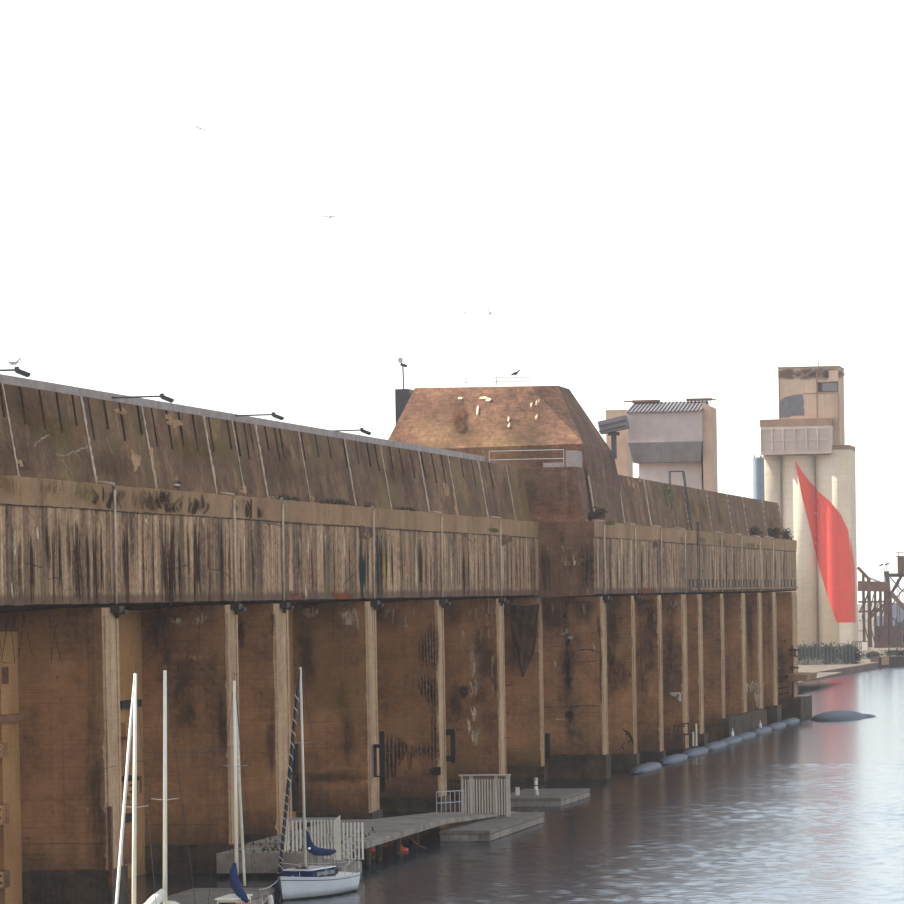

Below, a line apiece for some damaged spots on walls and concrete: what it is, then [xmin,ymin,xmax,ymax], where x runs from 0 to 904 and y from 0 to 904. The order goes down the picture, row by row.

damp [91,486,125,509]
spalling [130,447,157,481]
crack [0,434,538,544]
damp [11,520,104,606]
damp [142,491,262,606]
damp [298,533,416,629]
damp [415,541,432,595]
damp [450,548,485,596]
damp [561,532,626,683]
damp [636,546,677,691]
spalling [462,630,479,745]
spalling [491,654,500,713]